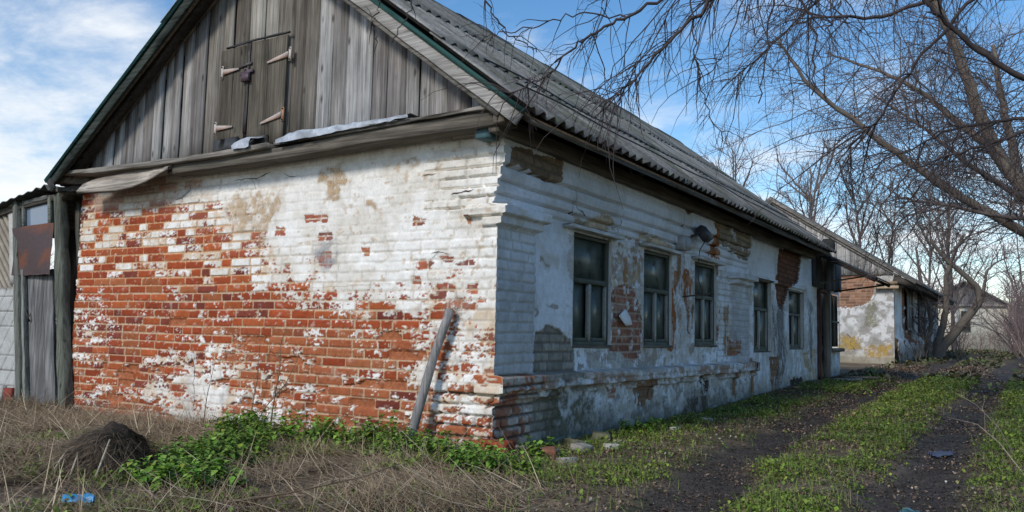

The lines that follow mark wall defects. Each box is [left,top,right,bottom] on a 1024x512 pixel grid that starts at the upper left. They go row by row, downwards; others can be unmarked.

spalling [505,146,564,184]
peeling [72,193,503,453]
peeling [527,213,673,445]
spalling [775,248,802,312]
peeling [832,273,882,309]
leakage [866,302,877,327]